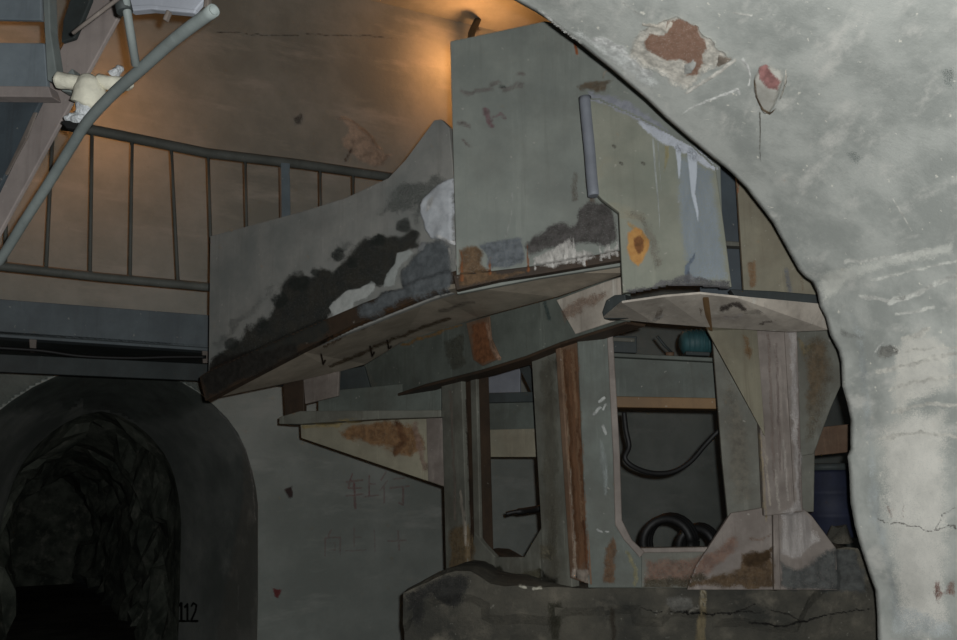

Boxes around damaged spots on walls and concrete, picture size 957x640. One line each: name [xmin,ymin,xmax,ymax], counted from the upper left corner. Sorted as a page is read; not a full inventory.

spalling [628,15,737,94]
water stain [212,174,446,393]
rust [458,245,530,287]
water stain [525,171,619,270]
rust [626,221,650,266]
rust [320,292,436,365]
rust [386,321,501,364]
rust [302,418,429,471]
rust [559,346,590,584]
rust [685,533,776,589]
crack [639,604,870,627]